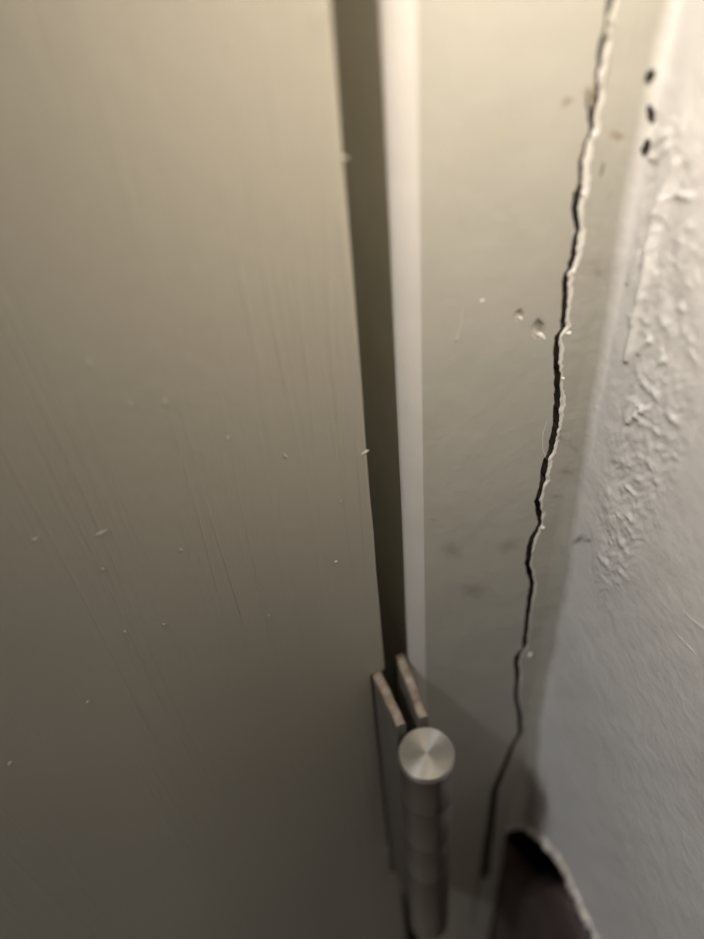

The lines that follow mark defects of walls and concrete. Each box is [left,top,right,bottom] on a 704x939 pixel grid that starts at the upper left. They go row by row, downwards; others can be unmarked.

crack [471,0,618,929]
flaking render [505,824,599,939]